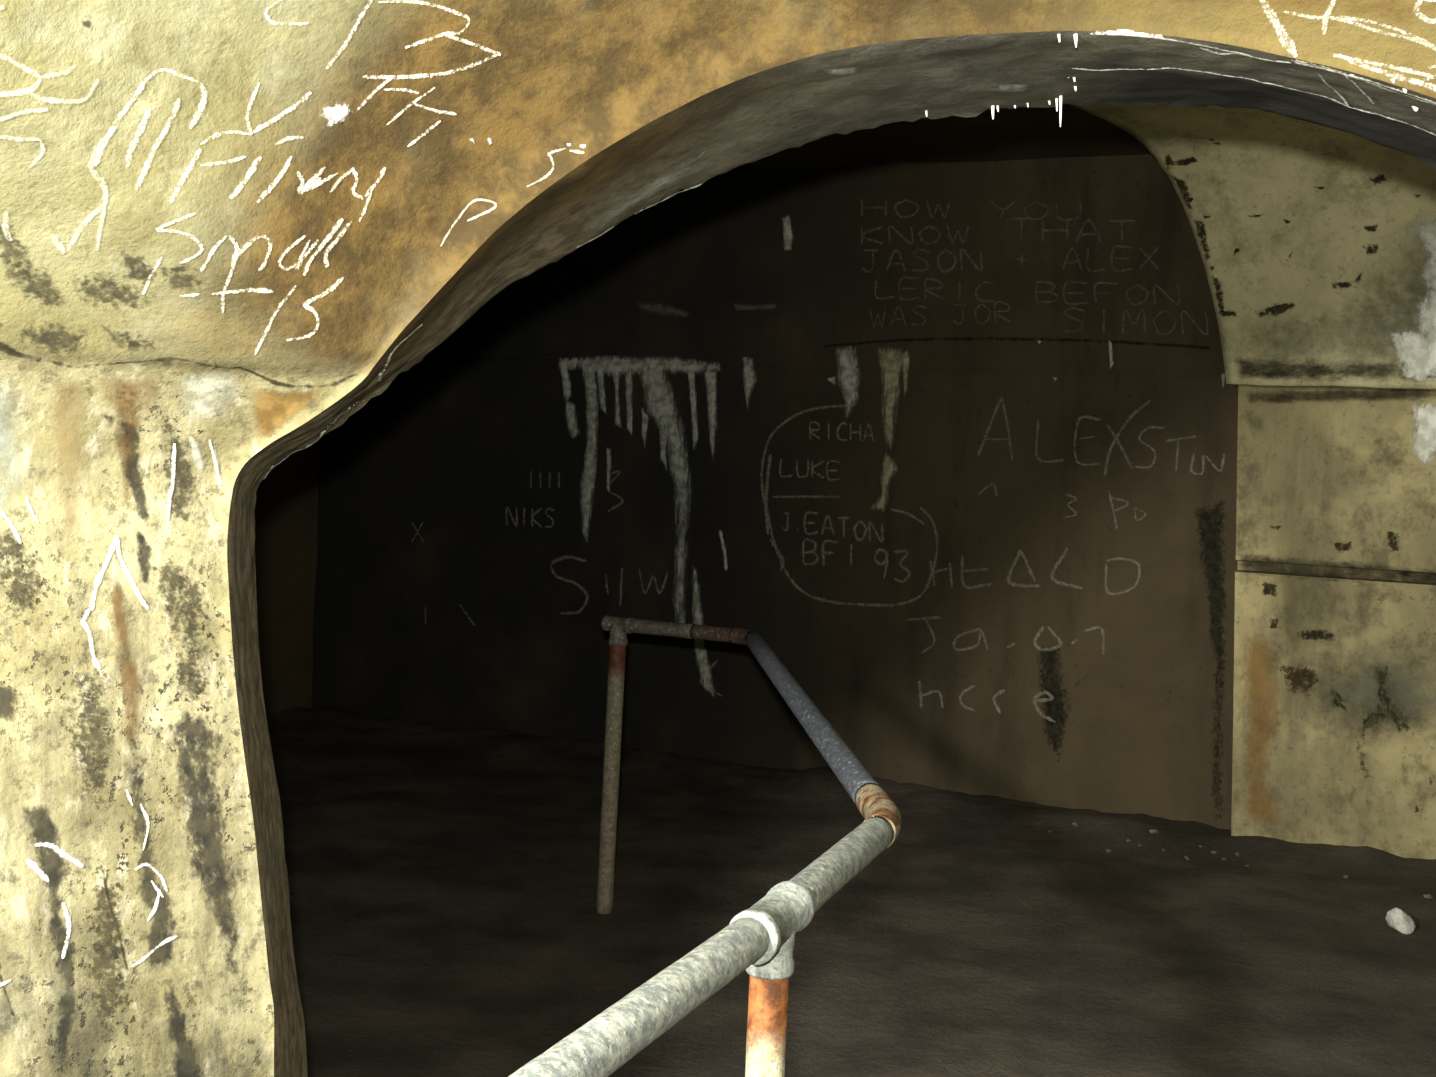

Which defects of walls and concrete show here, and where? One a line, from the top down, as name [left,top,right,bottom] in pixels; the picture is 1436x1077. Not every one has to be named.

water stain [1341,219,1436,381]
water stain [0,687,16,718]
water stain [81,536,149,669]
corrosion [113,585,138,744]
corrosion [118,385,137,475]
water stain [166,438,221,520]
water stain [559,356,719,696]
water stain [1412,403,1436,463]
water stain [131,745,175,965]
water stain [170,713,238,972]
water stain [25,807,83,1064]
water stain [165,988,203,1077]